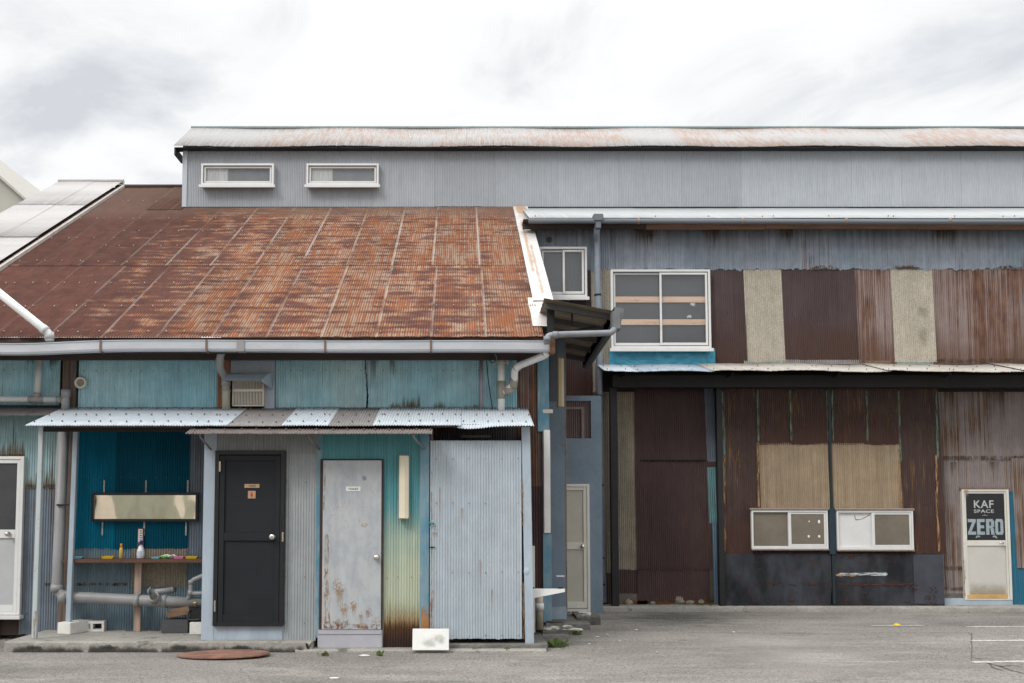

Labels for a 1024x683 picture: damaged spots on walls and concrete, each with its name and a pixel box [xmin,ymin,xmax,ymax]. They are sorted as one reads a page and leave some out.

crack [363,360,371,408]
rust [944,456,1023,470]
rust [324,569,434,647]